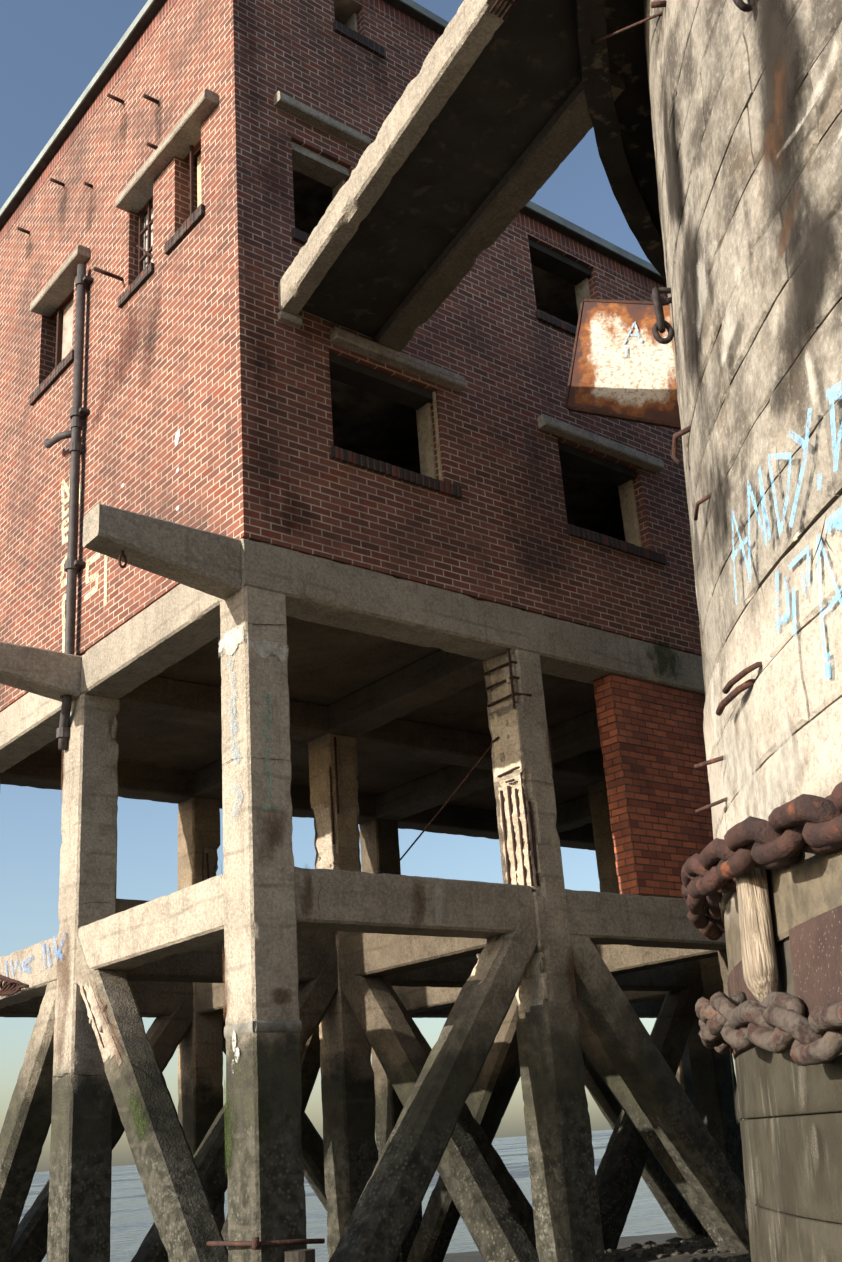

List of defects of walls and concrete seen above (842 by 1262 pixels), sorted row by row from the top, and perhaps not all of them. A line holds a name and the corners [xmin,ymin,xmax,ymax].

corrosion [763,65,784,164]
leakage [664,90,707,385]
leakage [752,0,832,399]
leakage [722,314,736,364]
peeling [218,626,289,662]
spalling [484,648,540,893]
spalling [80,983,122,1066]
spalling [515,952,548,1019]
leakage [224,1083,232,1165]
leakage [258,1100,269,1141]